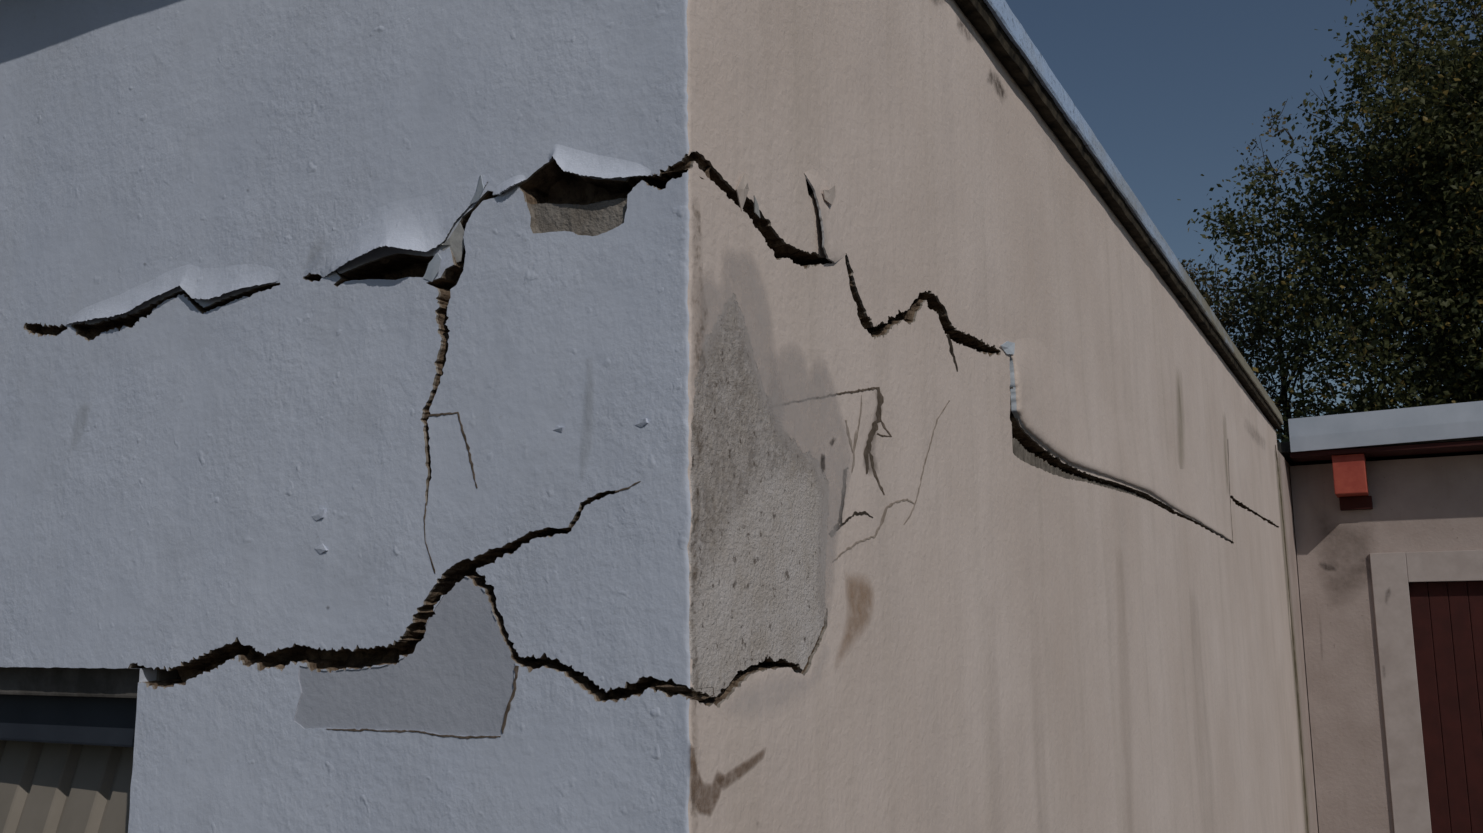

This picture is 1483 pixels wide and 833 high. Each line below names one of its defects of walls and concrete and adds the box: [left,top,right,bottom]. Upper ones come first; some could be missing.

flaking render [518,159,636,236]
peeling [294,577,516,736]
crack [23,175,828,739]
peeling [688,293,829,697]
crack [626,151,1309,833]